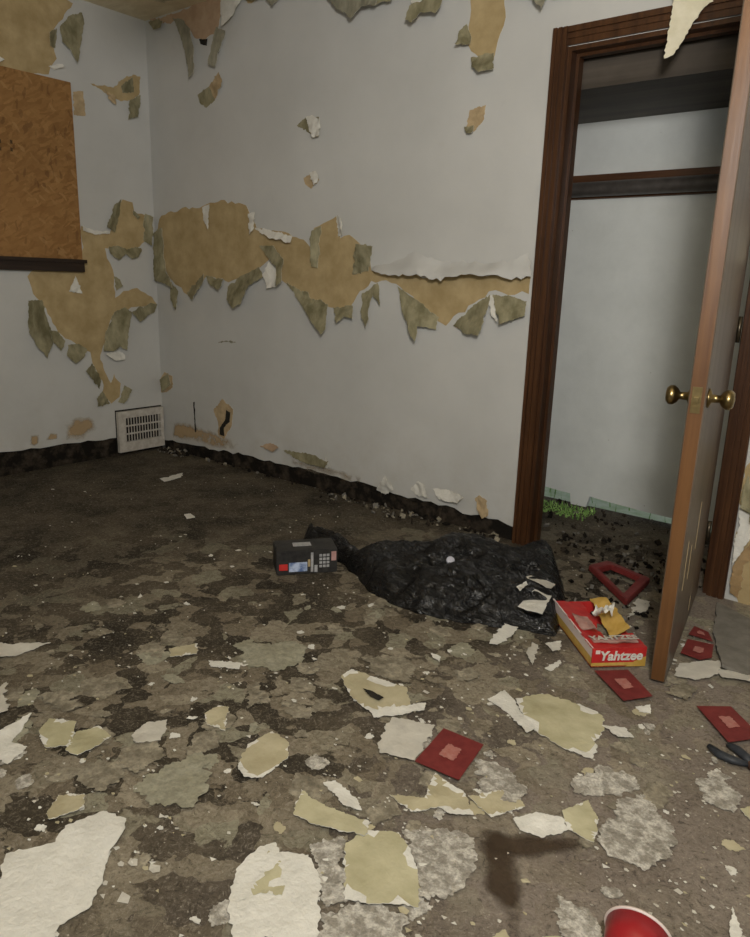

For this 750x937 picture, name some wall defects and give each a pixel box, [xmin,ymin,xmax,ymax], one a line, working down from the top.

spalling [214,398,233,439]